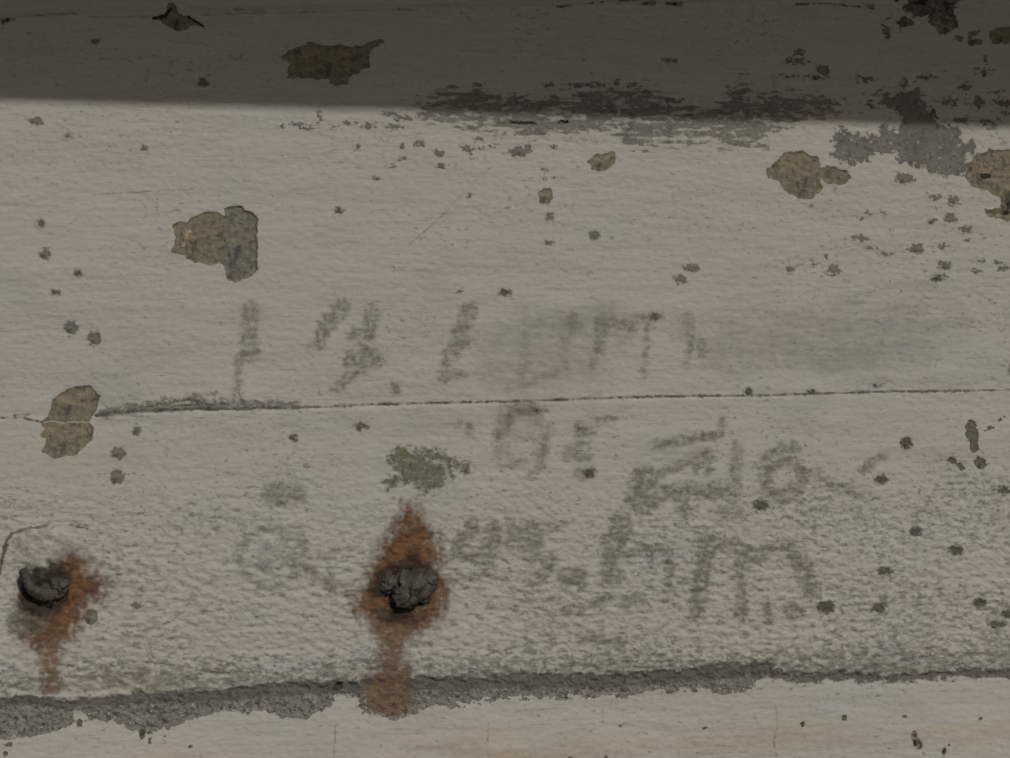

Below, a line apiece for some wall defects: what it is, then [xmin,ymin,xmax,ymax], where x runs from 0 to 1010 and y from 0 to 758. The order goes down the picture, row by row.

spalling [152,3,205,31]
spalling [280,39,385,86]
peeling [333,0,1010,223]
spalling [171,205,258,283]
peeling [931,243,951,281]
peeling [928,194,971,242]
spalling [40,385,300,459]
crack [94,389,996,417]
corrosion [11,552,103,693]
corrosion [354,506,449,713]
peeling [0,685,337,757]
peeling [348,671,766,721]